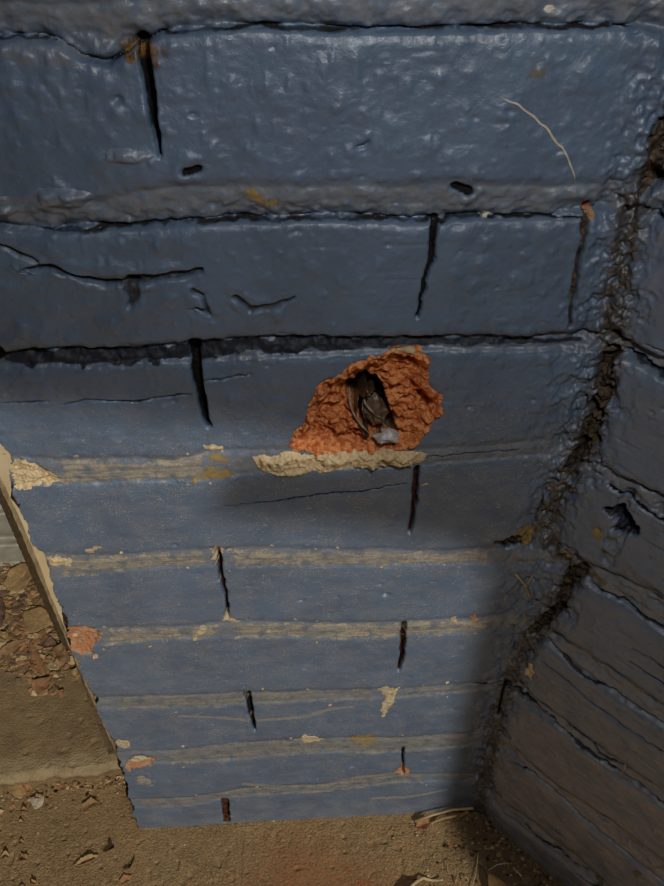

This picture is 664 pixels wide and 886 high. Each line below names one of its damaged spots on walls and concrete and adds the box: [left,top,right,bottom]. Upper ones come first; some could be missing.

crack [205,22,356,32]
crack [472,22,627,30]
crack [106,29,182,153]
crack [4,207,587,425]
spalling [253,344,444,477]
crack [564,343,664,468]
peeling [9,444,224,490]
crack [216,548,229,615]
peeling [47,545,487,576]
peeling [66,607,490,659]
peeling [115,681,469,722]
spalling [115,739,155,771]